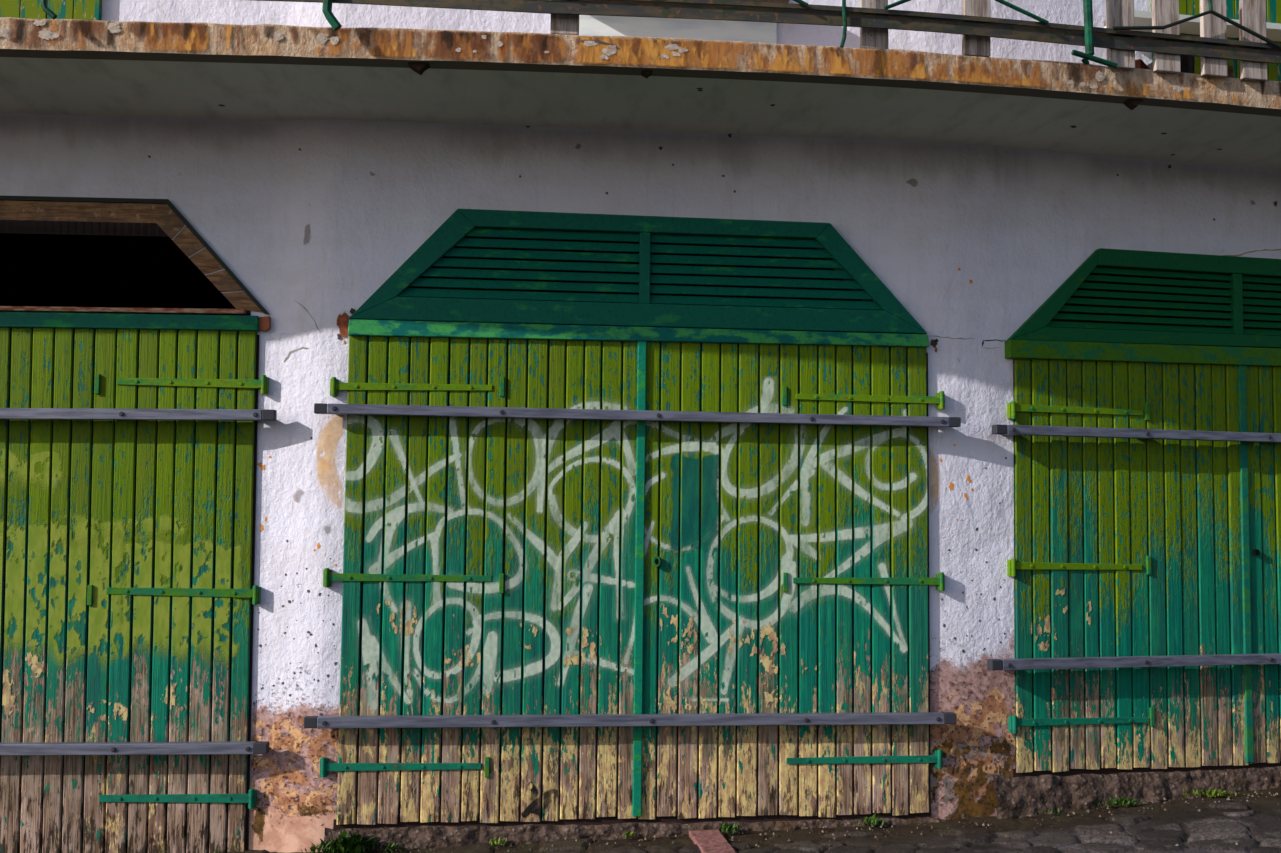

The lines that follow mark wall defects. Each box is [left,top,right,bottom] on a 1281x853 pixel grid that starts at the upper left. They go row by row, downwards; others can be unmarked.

corrosion [10,19,209,51]
corrosion [225,24,273,48]
corrosion [290,27,1281,106]